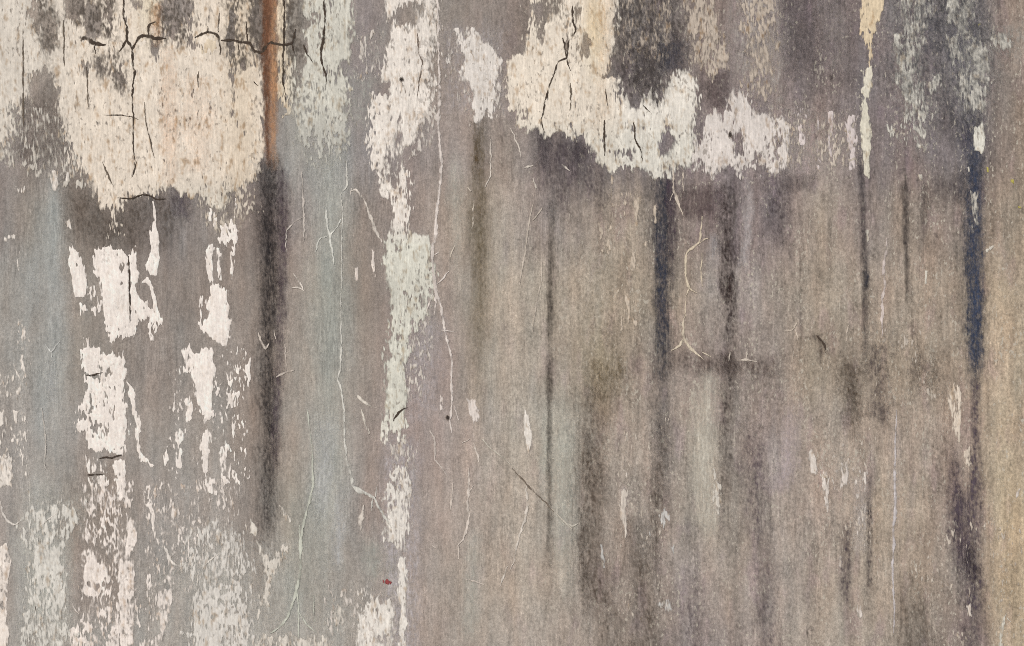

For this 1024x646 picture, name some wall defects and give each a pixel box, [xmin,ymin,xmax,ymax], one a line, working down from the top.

crack [63,0,166,200]
crack [195,0,327,100]
rust [261,0,277,155]
peeling [814,0,884,179]
water stain [260,161,285,357]
peeling [0,0,807,646]
crack [417,0,578,586]
water stain [964,157,983,367]
water stain [948,385,982,612]
peeling [914,518,1022,616]